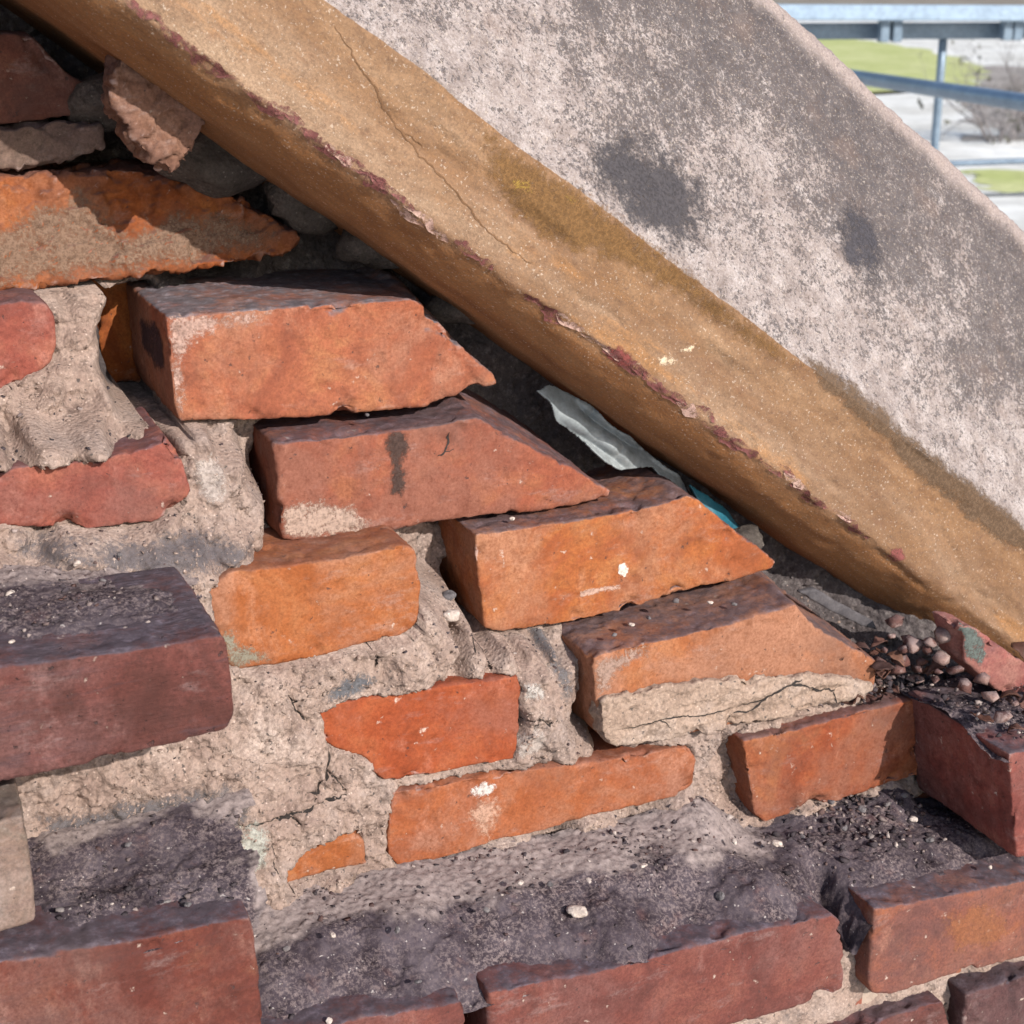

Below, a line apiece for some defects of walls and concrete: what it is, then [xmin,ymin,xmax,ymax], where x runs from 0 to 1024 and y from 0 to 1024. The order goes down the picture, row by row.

peeling [127,0,493,270]
crack [335,28,533,263]
leakage [485,131,787,363]
leakage [837,204,888,285]
peeling [524,294,827,509]
peeling [838,511,871,539]
crack [619,680,839,730]